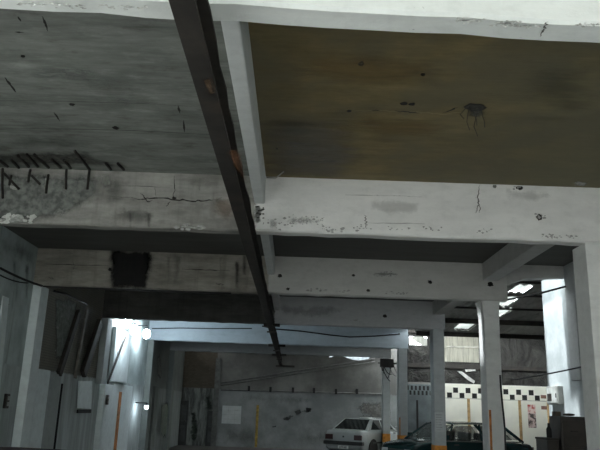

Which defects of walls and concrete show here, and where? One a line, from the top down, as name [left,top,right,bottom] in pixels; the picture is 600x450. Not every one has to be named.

spalling [0,150,125,224]
crack [113,180,222,206]